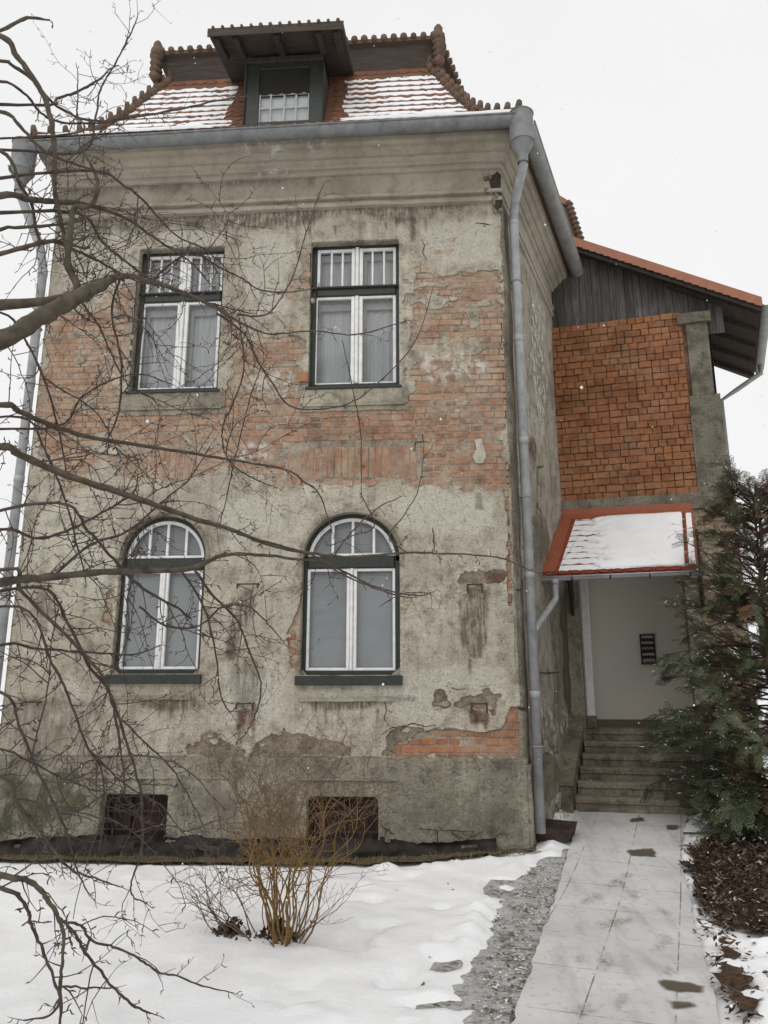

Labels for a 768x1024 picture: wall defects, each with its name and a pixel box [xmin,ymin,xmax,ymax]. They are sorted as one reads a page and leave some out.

damp [65,210,340,237]
damp [355,205,462,239]
spalling [277,248,312,300]
spalling [36,262,516,618]
damp [459,589,487,669]
flaking render [184,728,351,757]
spalling [382,682,519,759]